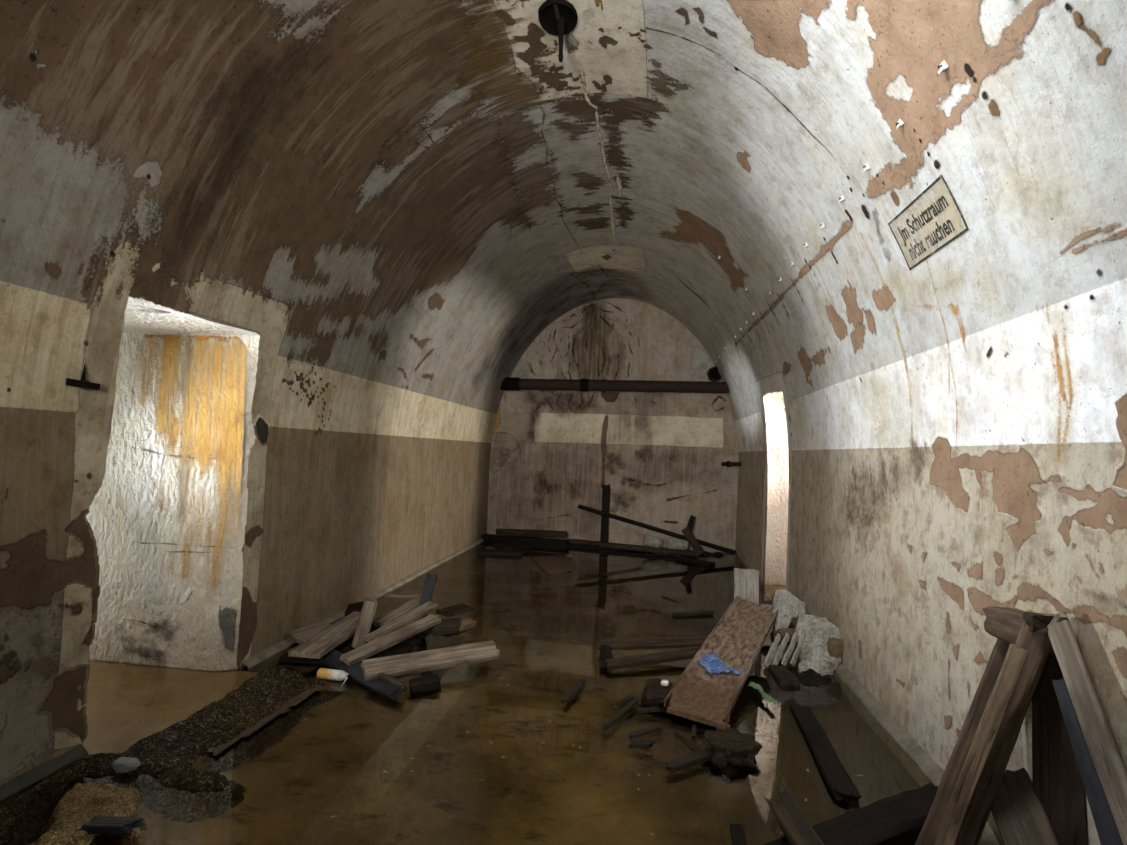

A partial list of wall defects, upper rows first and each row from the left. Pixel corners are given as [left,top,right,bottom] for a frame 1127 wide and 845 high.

peeling [0,0,691,389]
peeling [675,7,717,38]
peeling [660,209,749,292]
peeling [737,150,751,172]
peeling [726,0,831,69]
peeling [845,0,1051,199]
corrosion [141,335,247,587]
crack [528,266,656,410]
peeling [782,285,895,387]
corrosion [1053,334,1072,457]
flaking render [911,384,1127,700]
flaking render [0,510,100,784]